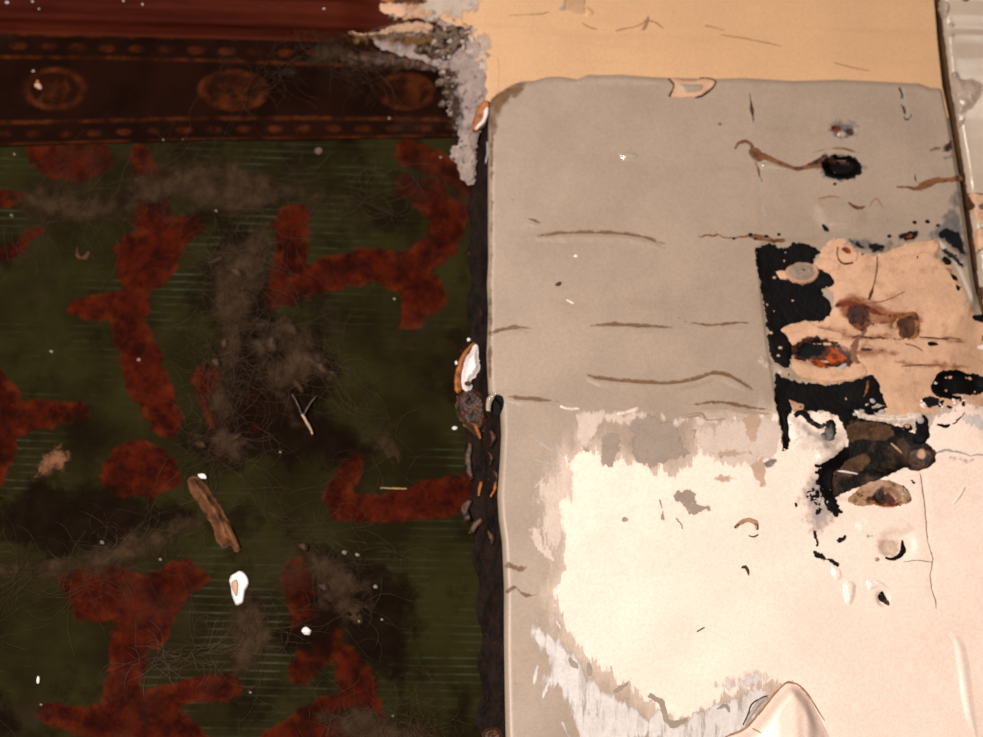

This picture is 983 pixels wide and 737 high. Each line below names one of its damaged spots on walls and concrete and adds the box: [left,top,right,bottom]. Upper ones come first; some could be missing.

leakage [390,0,479,22]
leakage [354,34,433,45]
peeling [668,77,716,98]
crack [734,94,822,181]
peeling [968,193,983,254]
rust [791,299,920,370]
peeling [758,238,983,415]
peeling [601,415,690,469]
peeling [529,527,554,562]
peeling [659,489,711,529]
peeling [734,518,759,538]